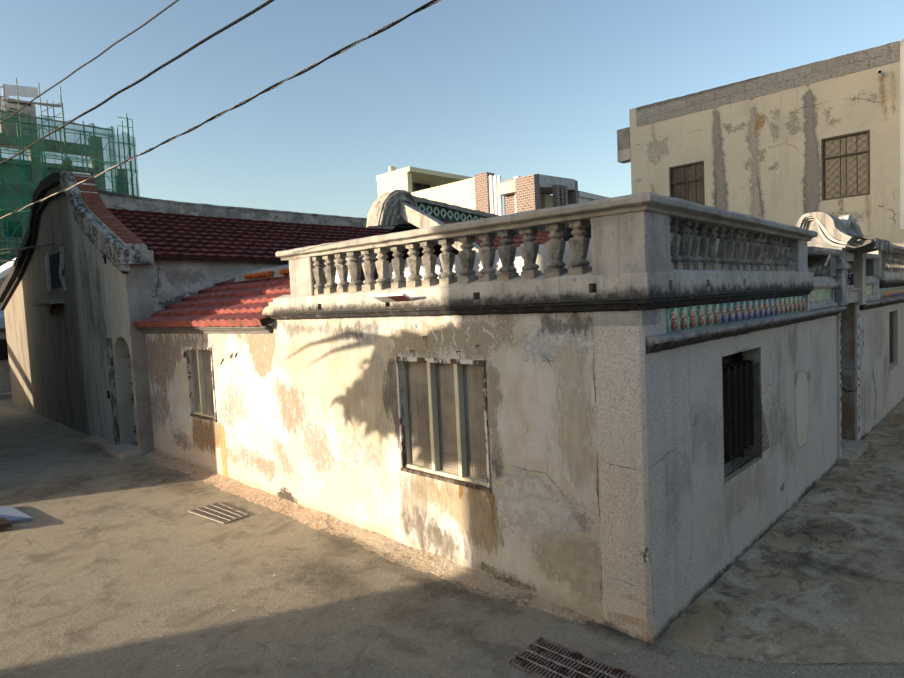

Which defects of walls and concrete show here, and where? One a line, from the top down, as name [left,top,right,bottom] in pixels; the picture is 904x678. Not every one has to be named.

peeling [222,377,299,505]
peeling [146,328,382,478]
leakage [382,355,403,446]
leakage [400,363,594,559]
crack [511,437,684,516]
crack [841,351,886,423]
leakage [481,562,535,590]